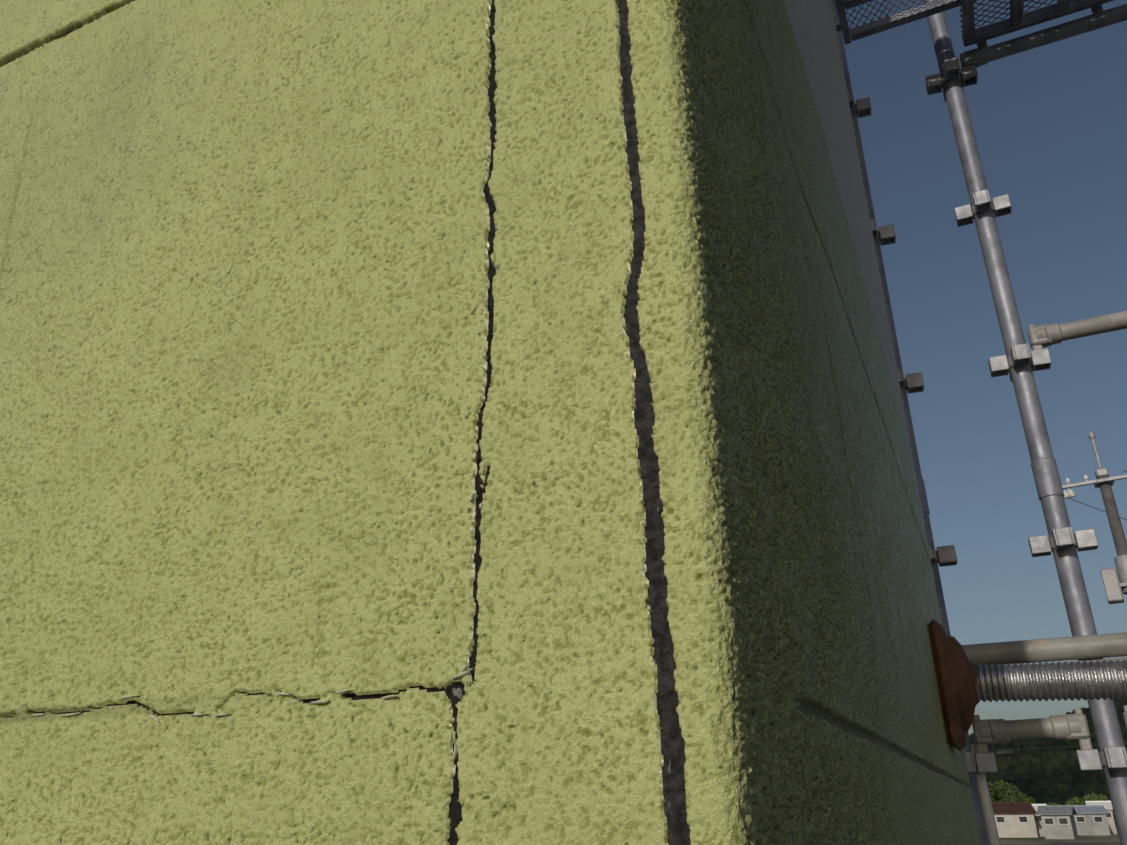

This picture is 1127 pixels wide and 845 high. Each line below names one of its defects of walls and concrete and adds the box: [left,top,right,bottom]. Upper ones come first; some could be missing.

crack [12,0,497,845]
crack [617,0,691,845]